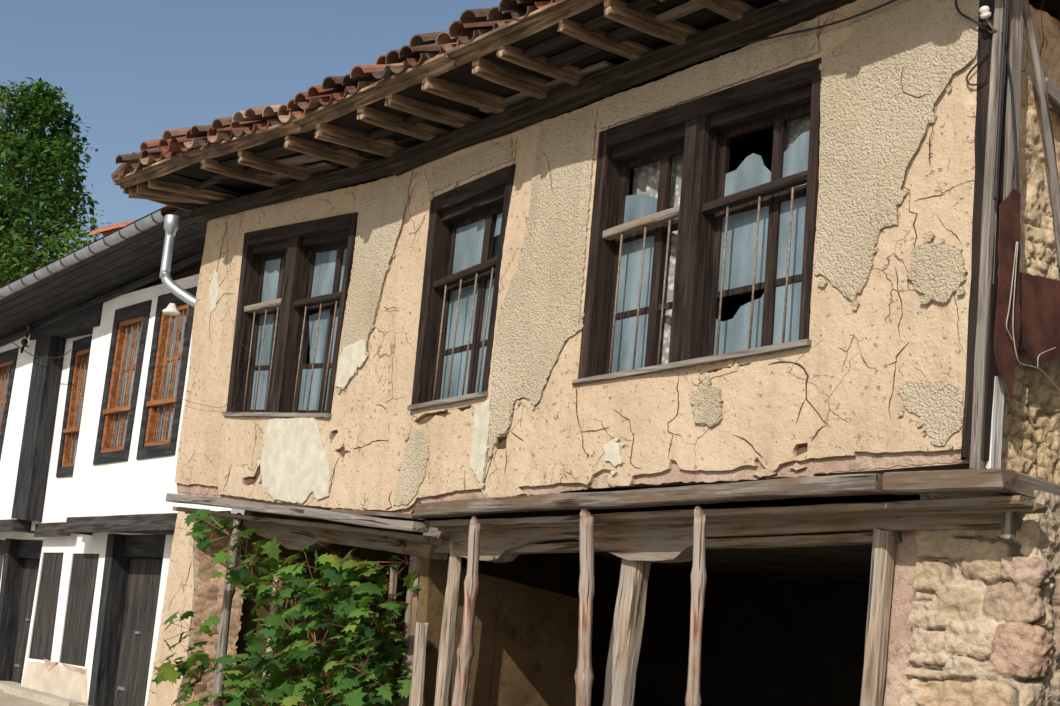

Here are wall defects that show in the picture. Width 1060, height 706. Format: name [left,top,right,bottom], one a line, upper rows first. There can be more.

peeling [335,171,417,394]
crack [340,170,429,391]
peeling [393,0,979,506]
crack [888,50,980,419]
peeling [245,417,350,504]
crack [768,361,830,440]